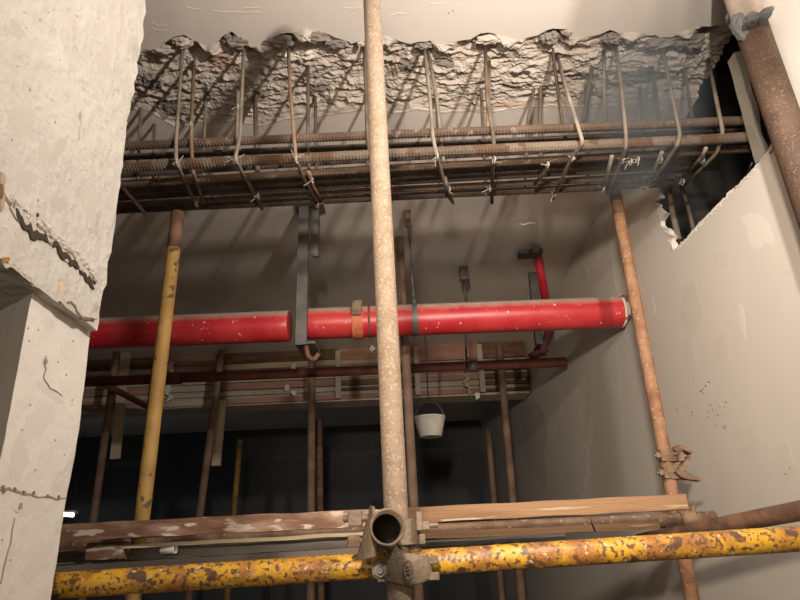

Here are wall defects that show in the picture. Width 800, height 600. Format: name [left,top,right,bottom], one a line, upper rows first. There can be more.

spalling [136,74,190,120]
spalling [206,51,241,70]
spalling [282,48,317,62]
spalling [310,79,335,95]
spalling [390,54,420,78]
spalling [613,67,658,87]
spalling [116,131,371,214]
spalling [388,116,752,201]
peeling [665,115,772,250]
flaking render [0,172,97,288]
crack [43,356,62,396]
crack [0,486,63,500]